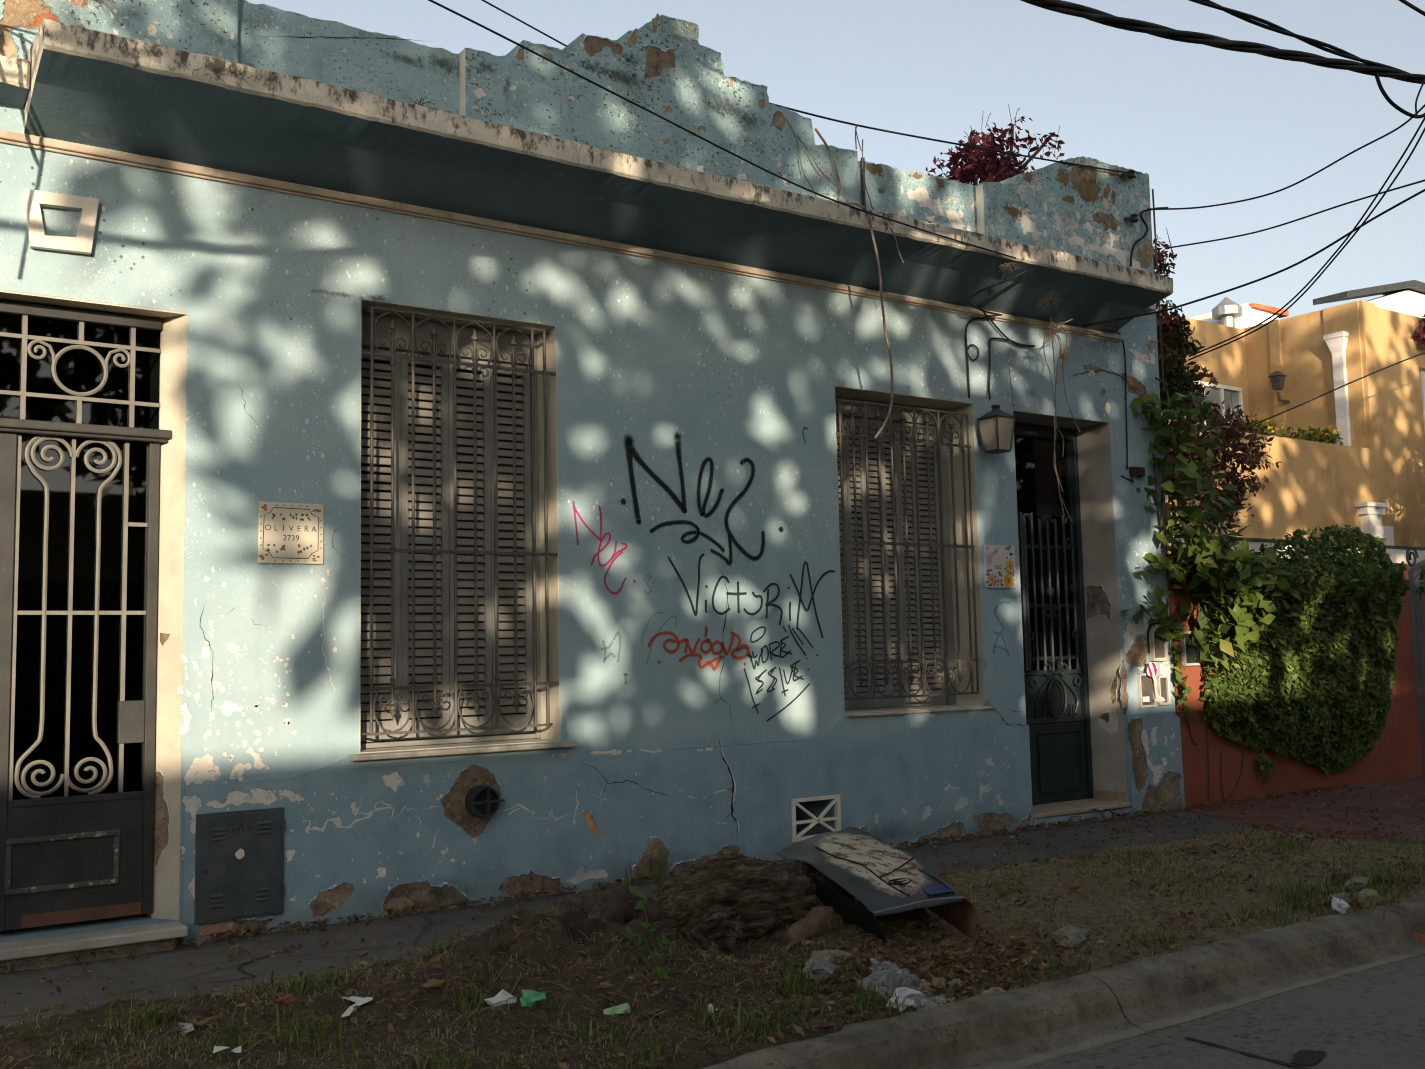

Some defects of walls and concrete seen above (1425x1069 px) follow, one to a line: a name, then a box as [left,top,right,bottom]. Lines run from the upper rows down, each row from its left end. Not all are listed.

spalling [0,0,90,58]
peeling [146,24,173,45]
spalling [583,14,677,81]
spalling [757,98,786,133]
peeling [897,185,971,231]
peeling [1007,164,1154,272]
crack [495,546,765,844]
spalling [1085,549,1182,815]
spalling [153,615,485,918]
spalling [498,749,667,897]
spalling [632,836,740,881]
peeling [901,735,1032,847]